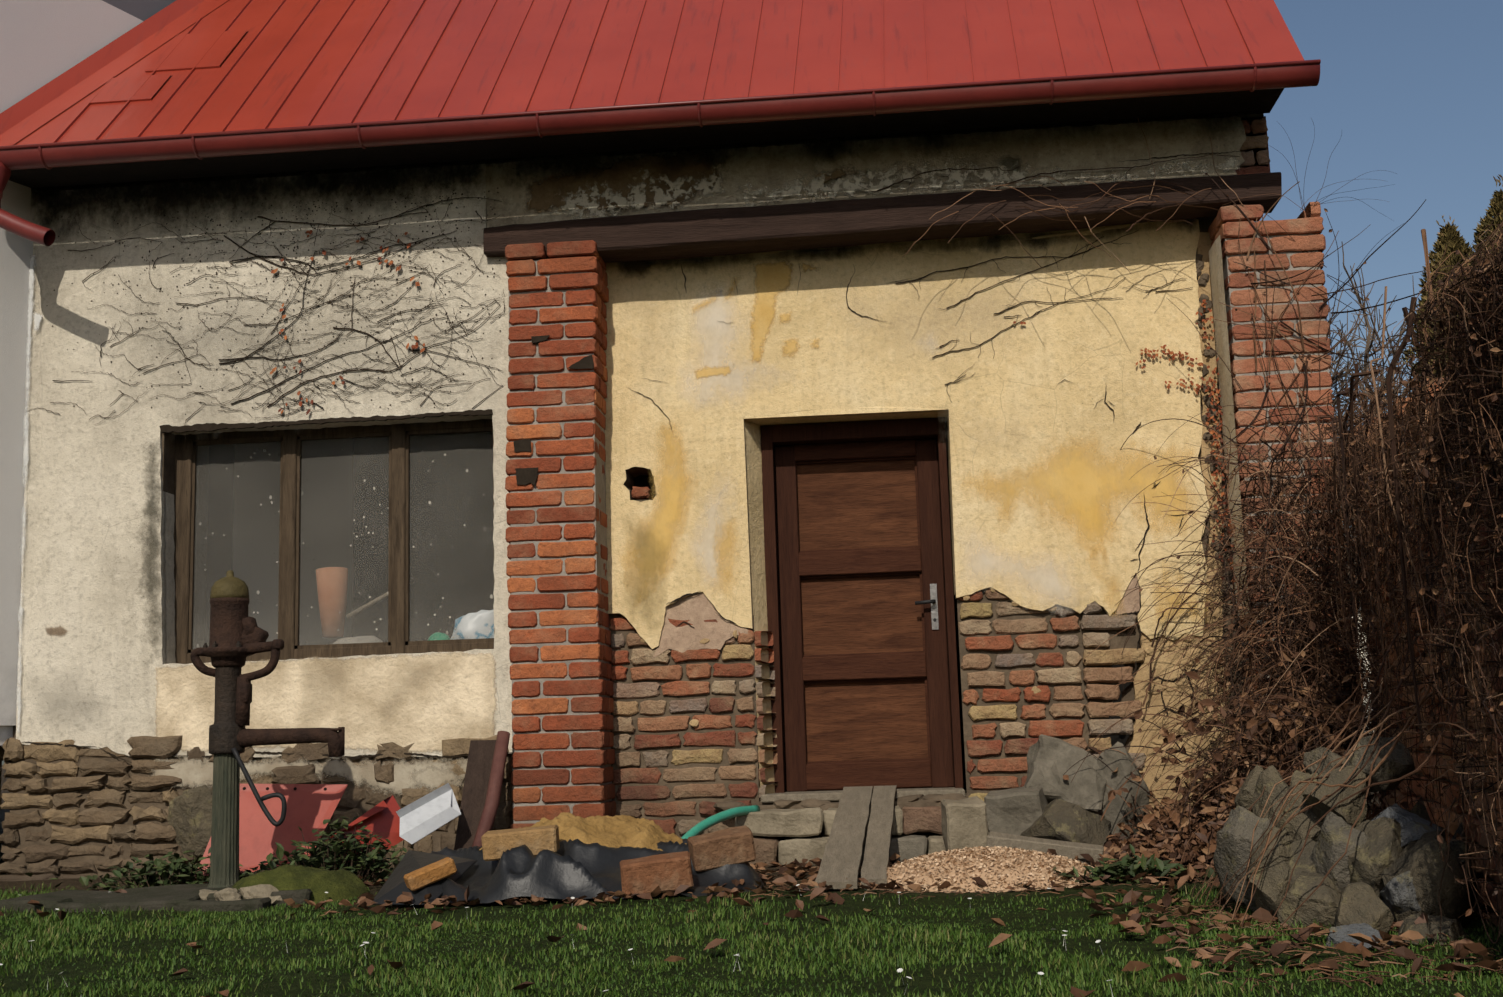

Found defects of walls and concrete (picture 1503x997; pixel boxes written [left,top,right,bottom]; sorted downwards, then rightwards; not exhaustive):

peeling [526,152,1131,219]
damp [145,471,159,640]
spalling [957,232,1233,816]
spalling [609,591,778,838]